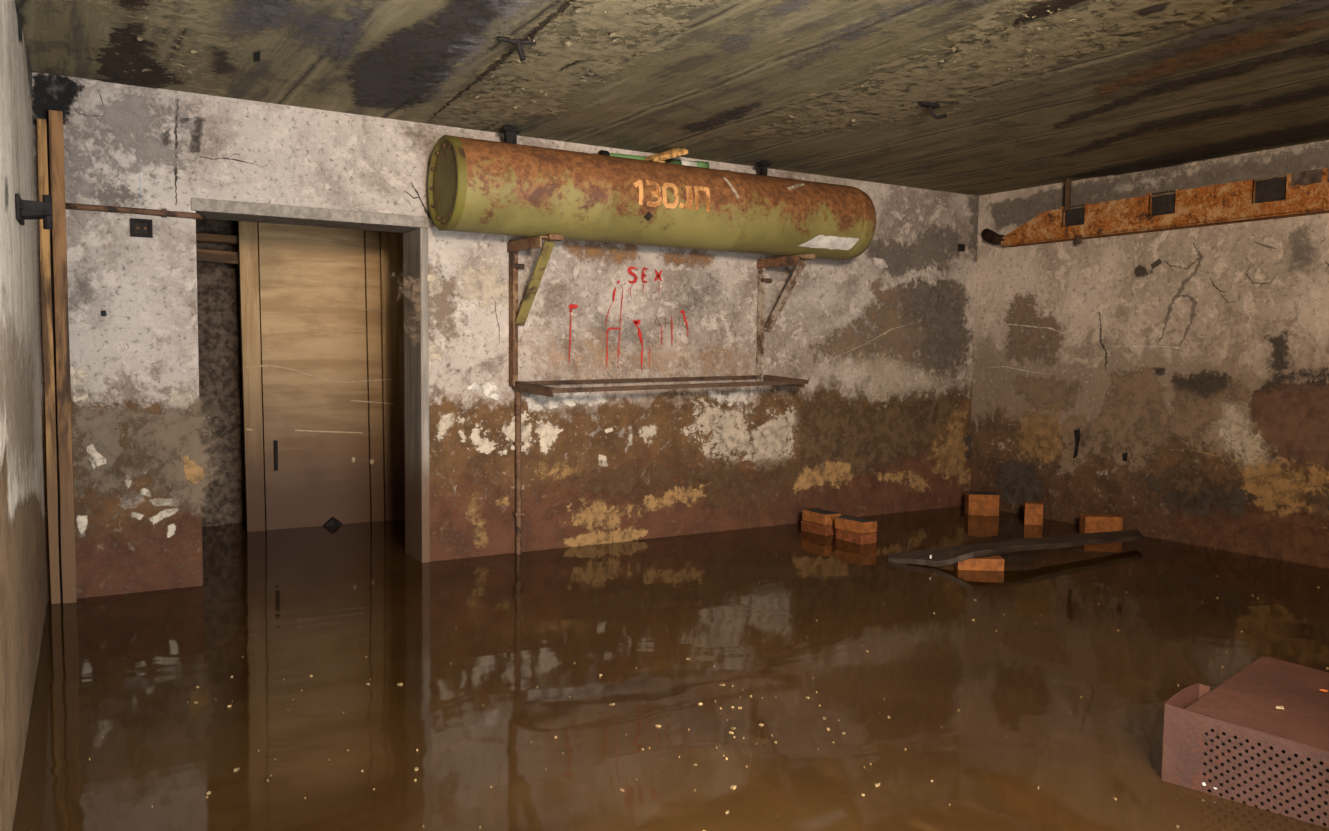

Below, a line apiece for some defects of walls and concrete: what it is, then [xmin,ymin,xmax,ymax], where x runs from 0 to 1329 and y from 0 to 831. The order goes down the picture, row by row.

damp [212,46,238,74]
damp [222,0,534,111]
damp [1055,39,1329,129]
damp [1066,85,1329,156]
crack [1210,241,1277,303]
damp [810,120,1329,519]
peeling [77,515,88,534]
flaking render [126,472,179,538]
damp [534,464,581,480]
flaking render [563,497,649,547]
damp [643,483,708,514]